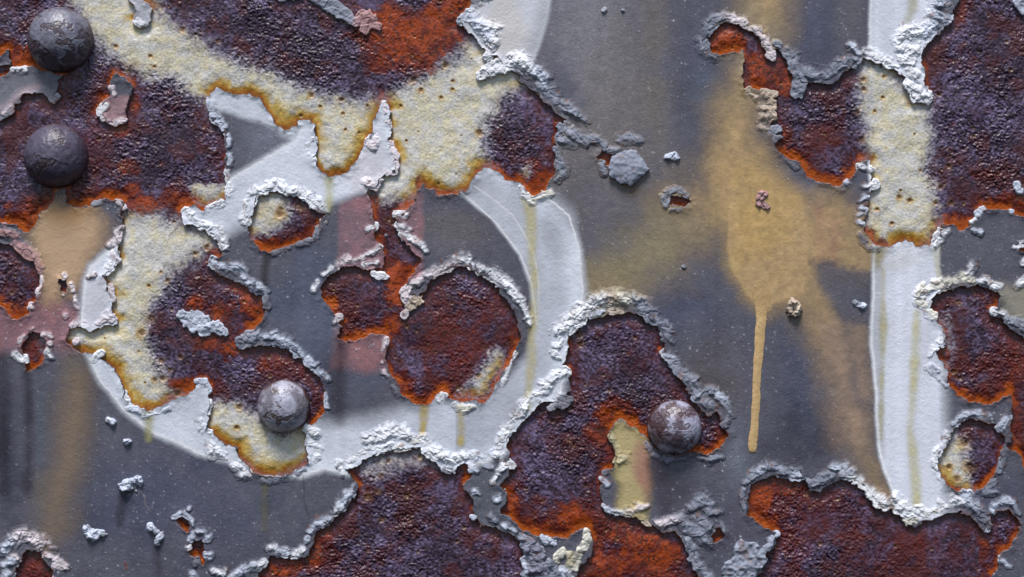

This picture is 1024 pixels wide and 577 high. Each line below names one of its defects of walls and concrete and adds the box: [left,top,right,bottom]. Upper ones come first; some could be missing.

corrosion [0,0,737,577]
peeling [755,190,770,210]
corrosion [694,0,1024,260]
corrosion [738,240,1024,577]